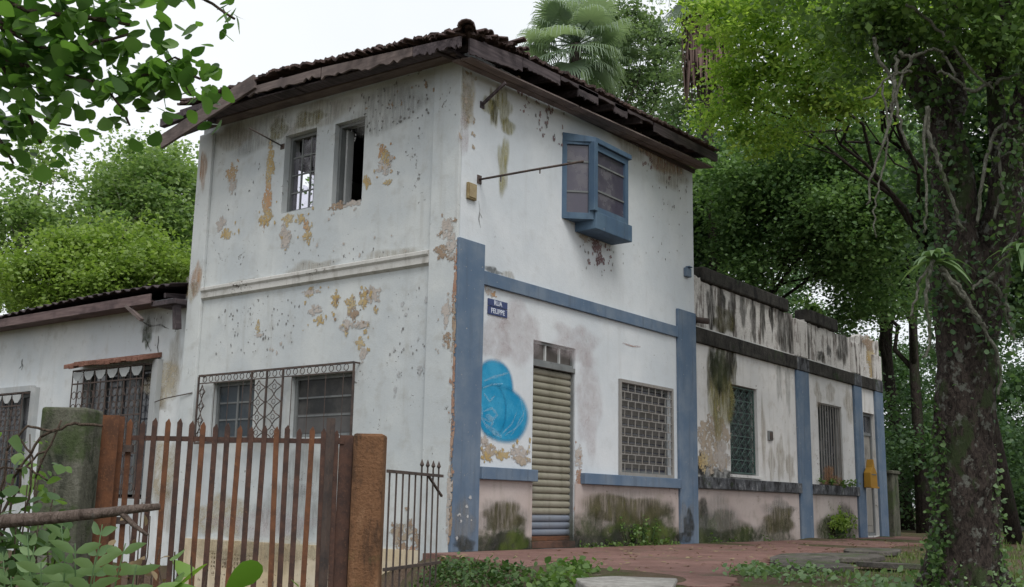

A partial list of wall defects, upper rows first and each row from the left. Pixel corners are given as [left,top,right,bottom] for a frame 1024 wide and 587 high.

damp [484,91,512,189]
peeling [216,141,320,265]
peeling [328,143,415,220]
peeling [216,285,381,363]
flaking render [389,214,472,551]
damp [707,347,737,430]
damp [707,285,794,353]
damp [807,332,848,363]
peeling [480,435,531,466]
mould [478,503,530,551]
damp [566,495,679,548]